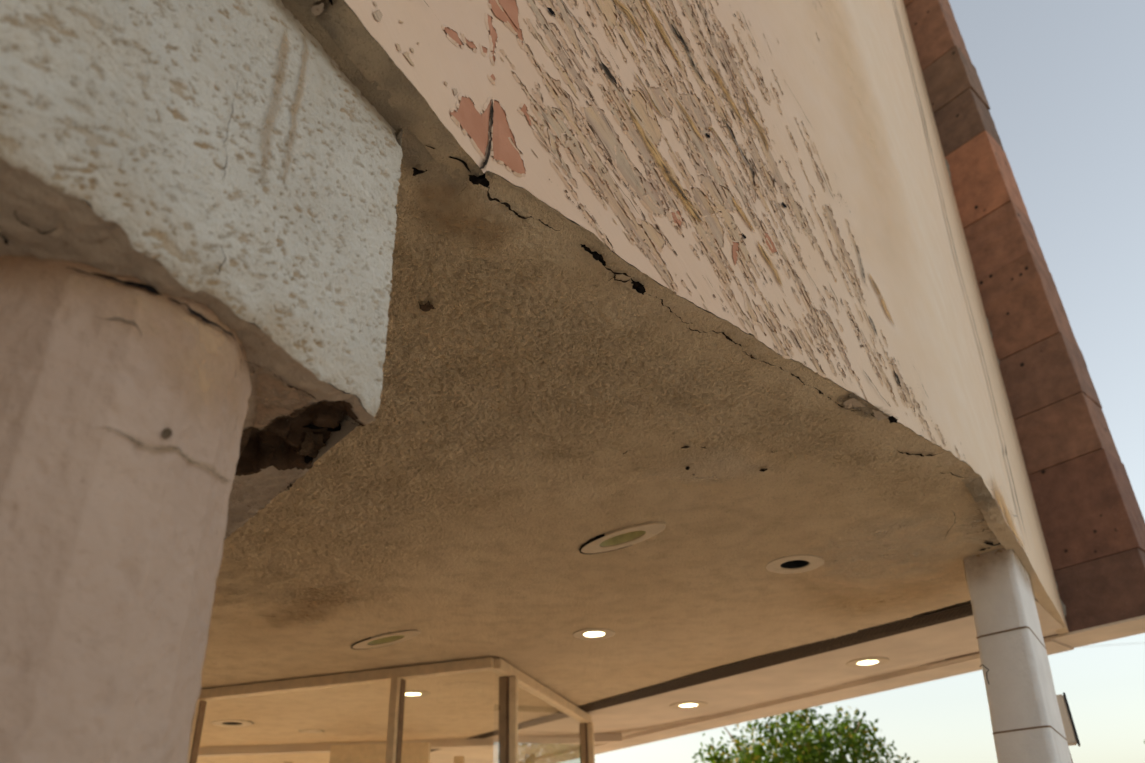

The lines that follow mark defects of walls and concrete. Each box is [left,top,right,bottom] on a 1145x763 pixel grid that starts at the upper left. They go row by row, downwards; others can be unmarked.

crack [559,0,838,301]
crack [0,210,58,246]
crack [412,100,923,419]
peeling [441,0,961,460]
crack [66,267,322,404]
spalling [235,401,365,476]
crack [897,450,967,478]